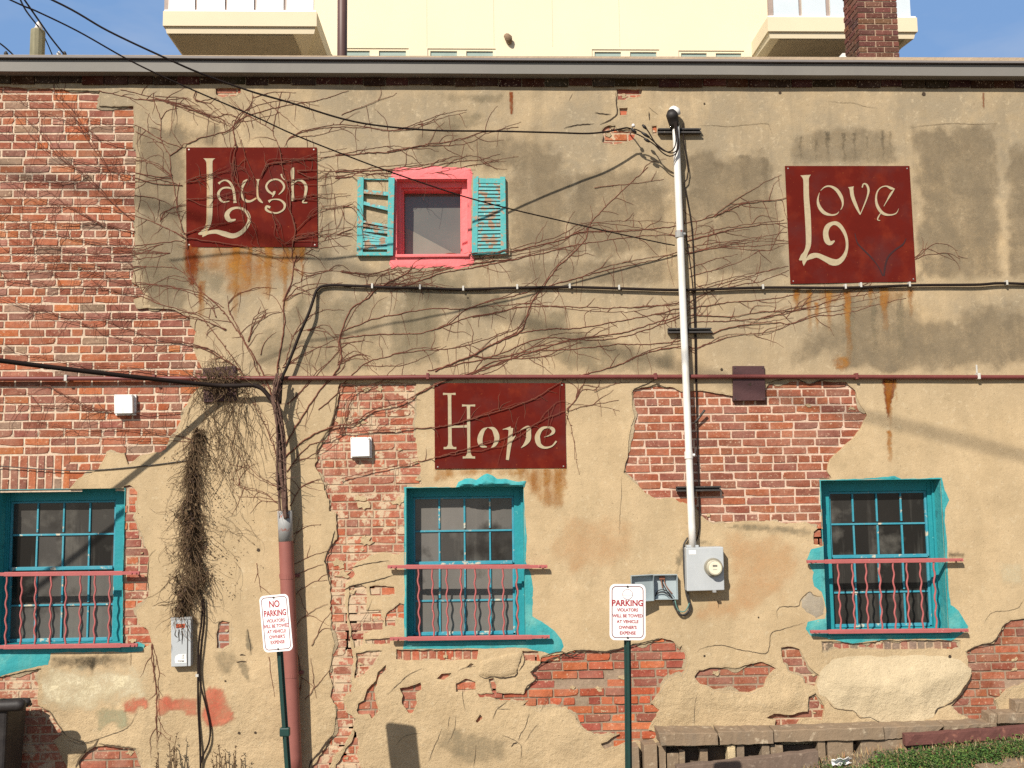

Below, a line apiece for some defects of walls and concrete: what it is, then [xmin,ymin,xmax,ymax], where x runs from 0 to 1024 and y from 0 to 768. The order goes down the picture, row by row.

water stain [914,126,1024,276]
flaking render [0,85,202,493]
rust [185,242,203,303]
rust [883,379,896,416]
flaking render [624,379,867,546]
crack [400,638,659,761]
flaking render [310,380,826,768]
crack [701,592,816,654]
flaking render [821,617,1024,728]